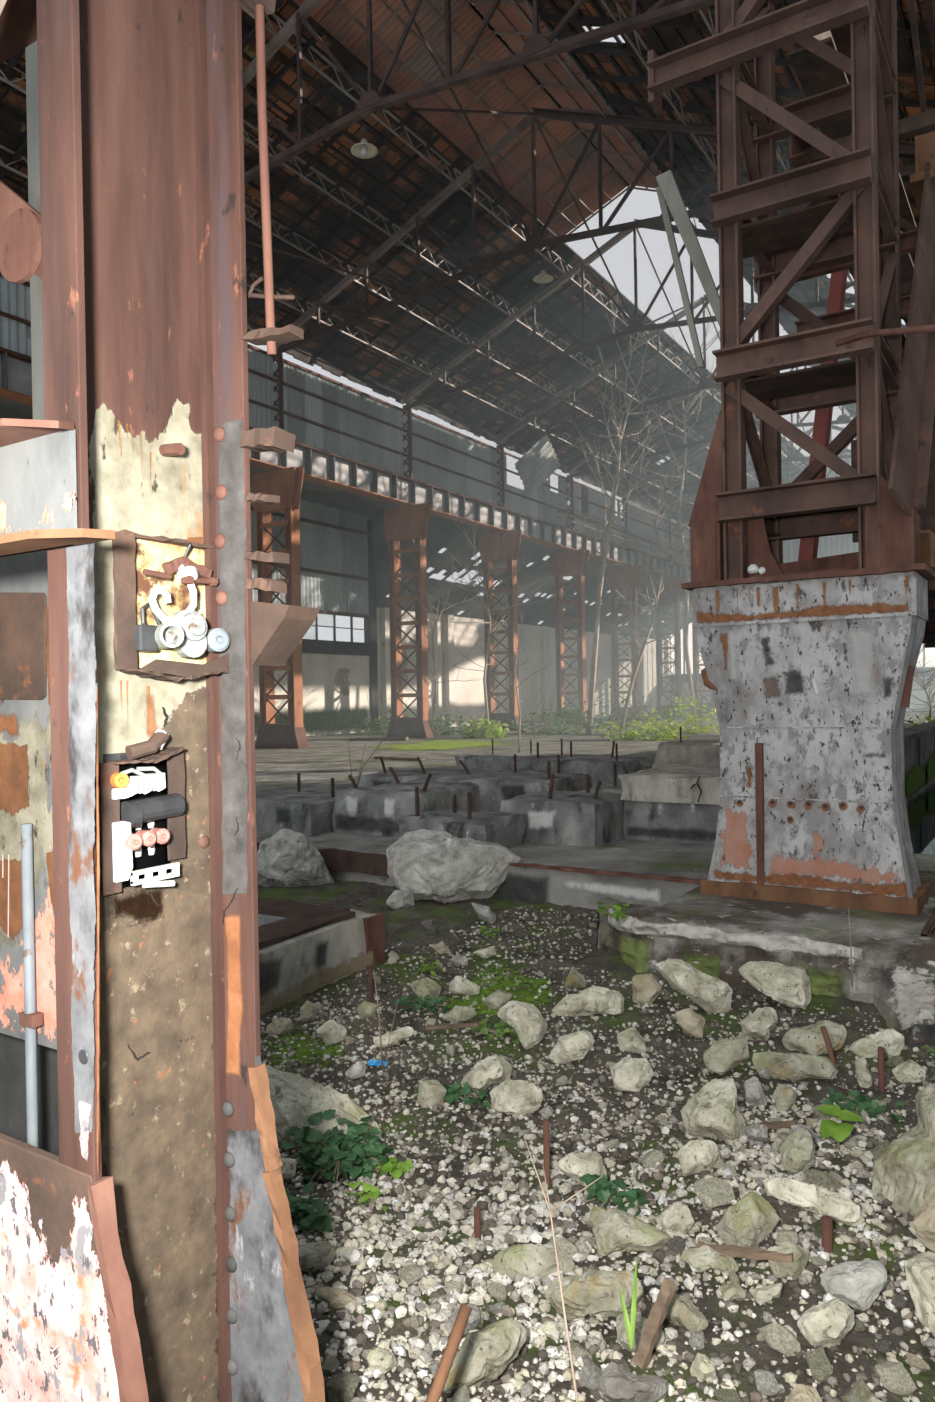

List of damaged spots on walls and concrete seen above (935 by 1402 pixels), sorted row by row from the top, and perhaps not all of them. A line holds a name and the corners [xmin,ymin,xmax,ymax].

corrosion [697,576,909,669]
corrosion [0,715,29,816]
peeling [0,399,248,1161]
peeling [719,807,754,870]
corrosion [714,870,908,896]
corrosion [769,799,865,824]
peeling [768,833,898,885]
peeling [0,1160,120,1402]